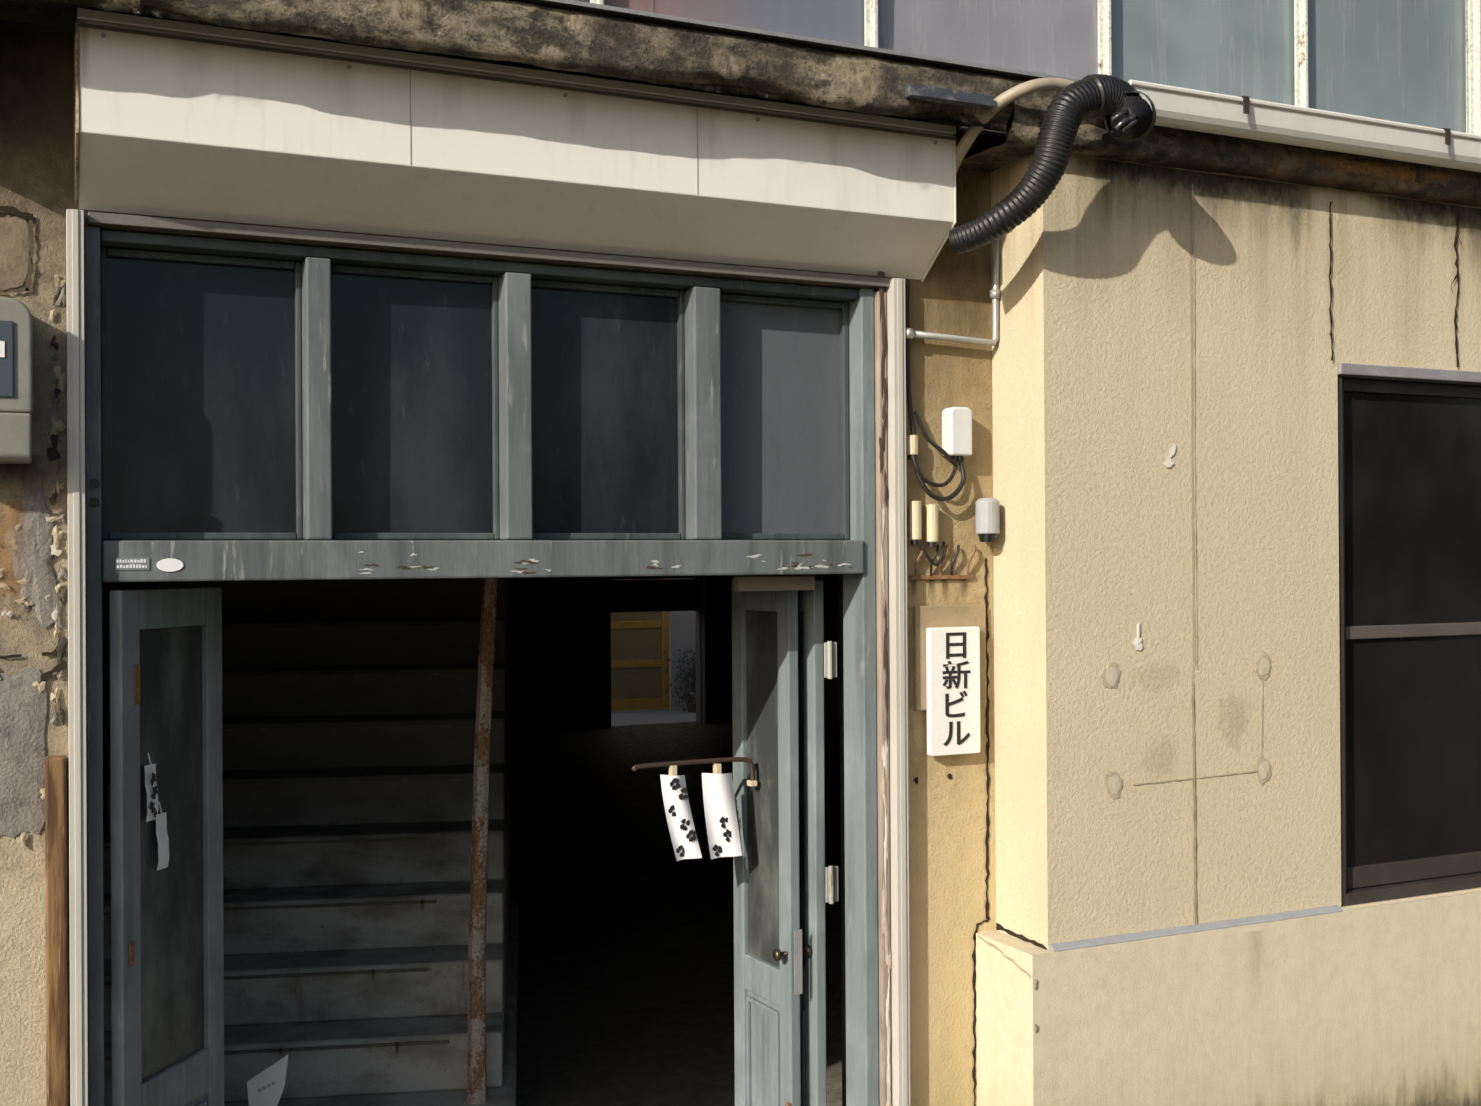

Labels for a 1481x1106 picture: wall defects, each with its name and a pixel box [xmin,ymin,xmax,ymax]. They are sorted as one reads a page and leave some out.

spalling [0,206,35,293]
leakage [1394,198,1481,223]
spalling [0,274,68,848]